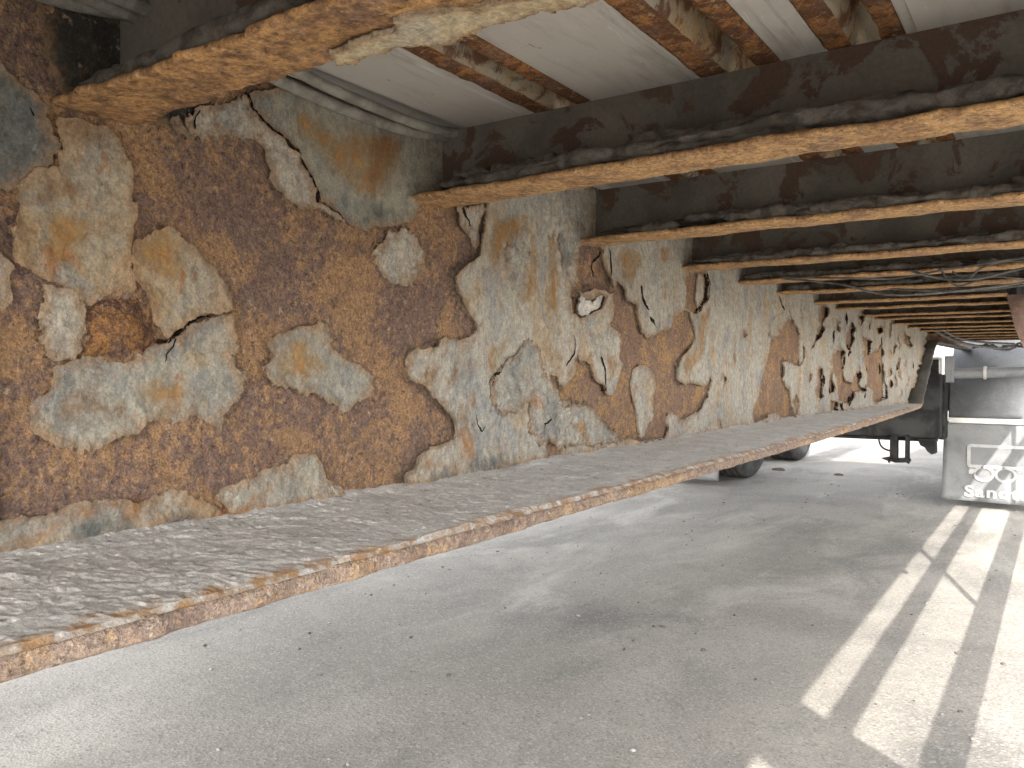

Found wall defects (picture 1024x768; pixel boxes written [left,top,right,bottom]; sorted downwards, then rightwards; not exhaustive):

peeling [0,62,248,455]
crack [156,313,210,362]
corrosion [0,0,480,521]
crack [245,92,345,219]
peeling [153,81,443,288]
crack [599,356,607,391]
crack [641,286,657,328]
peeling [393,186,927,485]
corrosion [437,74,1024,189]
corrosion [551,229,1024,439]
corrosion [600,176,1024,233]
peeling [0,452,345,552]